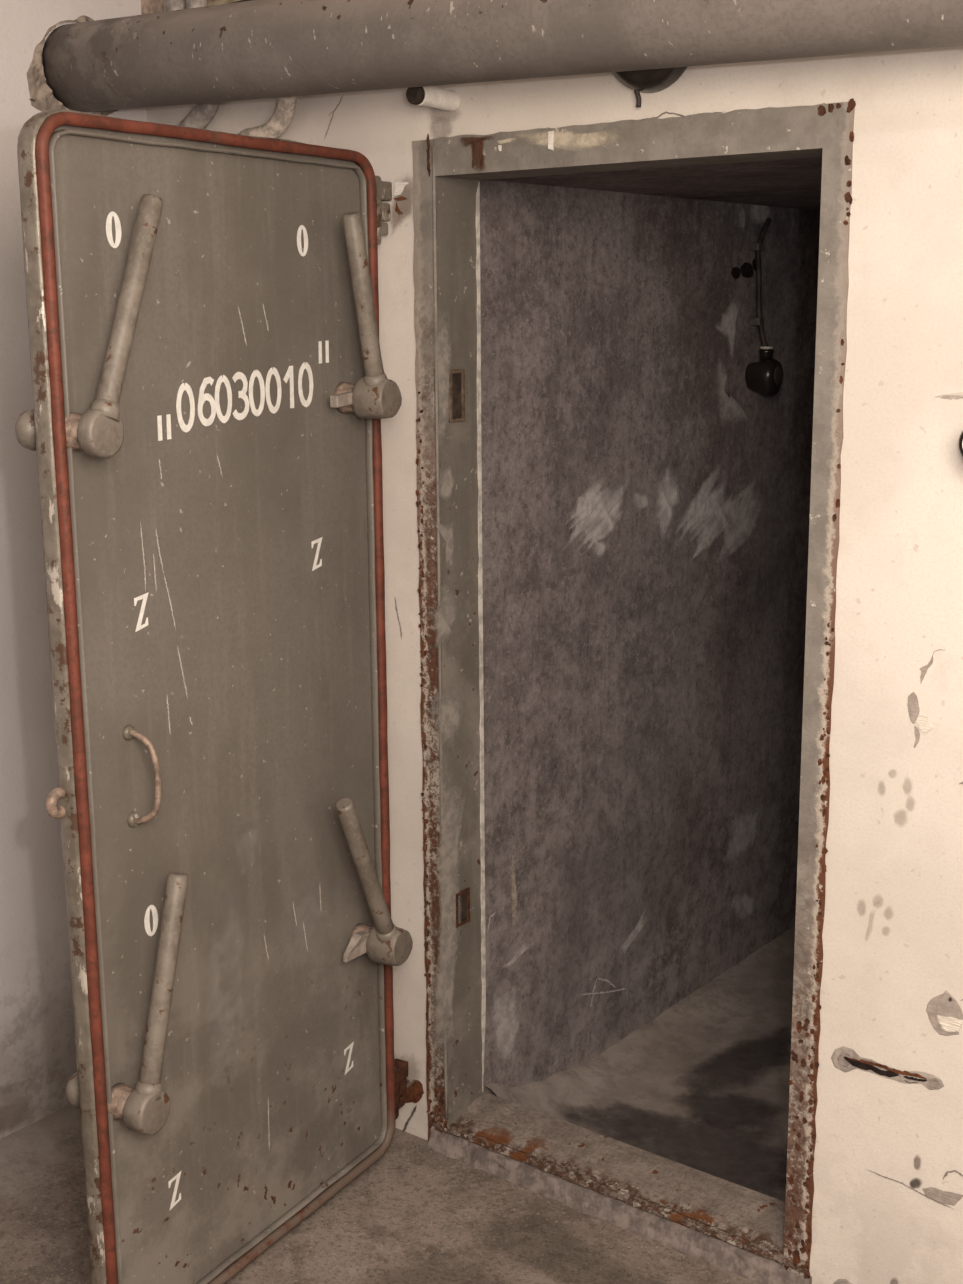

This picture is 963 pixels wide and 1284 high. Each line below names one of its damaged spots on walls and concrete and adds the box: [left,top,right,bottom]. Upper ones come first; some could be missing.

flaking render [26,15,94,112]
corrosion [461,136,491,169]
corrosion [818,98,856,116]
corrosion [843,131,854,225]
corrosion [416,410,427,707]
peeling [907,649,941,748]
corrosion [818,707,831,817]
corrosion [421,789,431,987]
peeling [926,991,963,1036]
corrosion [402,1004,448,1133]
corrosion [784,962,821,1279]
crack [869,1170,963,1209]